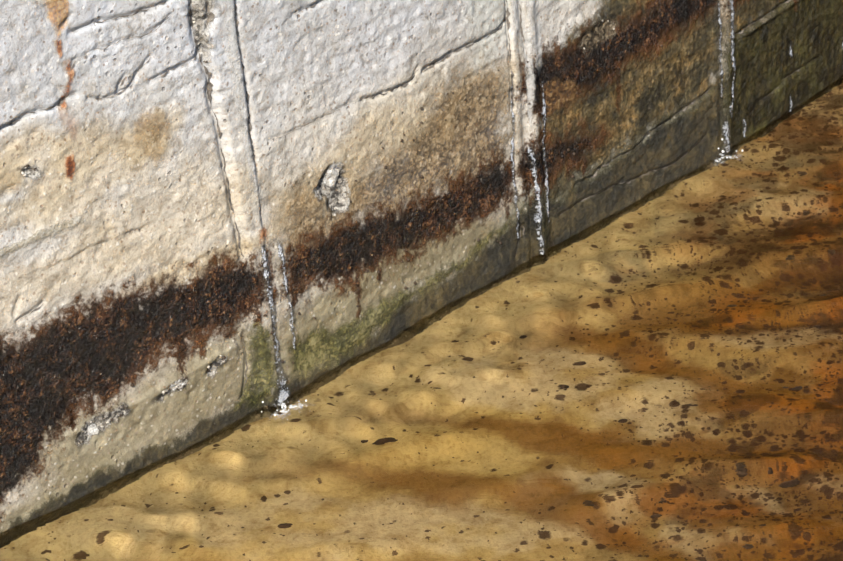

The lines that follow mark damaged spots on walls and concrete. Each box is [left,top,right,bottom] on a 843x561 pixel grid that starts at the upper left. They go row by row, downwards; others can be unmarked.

rust [46,0,75,108]
rust [65,154,75,180]
leakage [226,0,257,192]
spalling [313,162,351,216]
leakage [511,0,728,251]
leakage [726,0,799,45]
leakage [0,64,610,530]